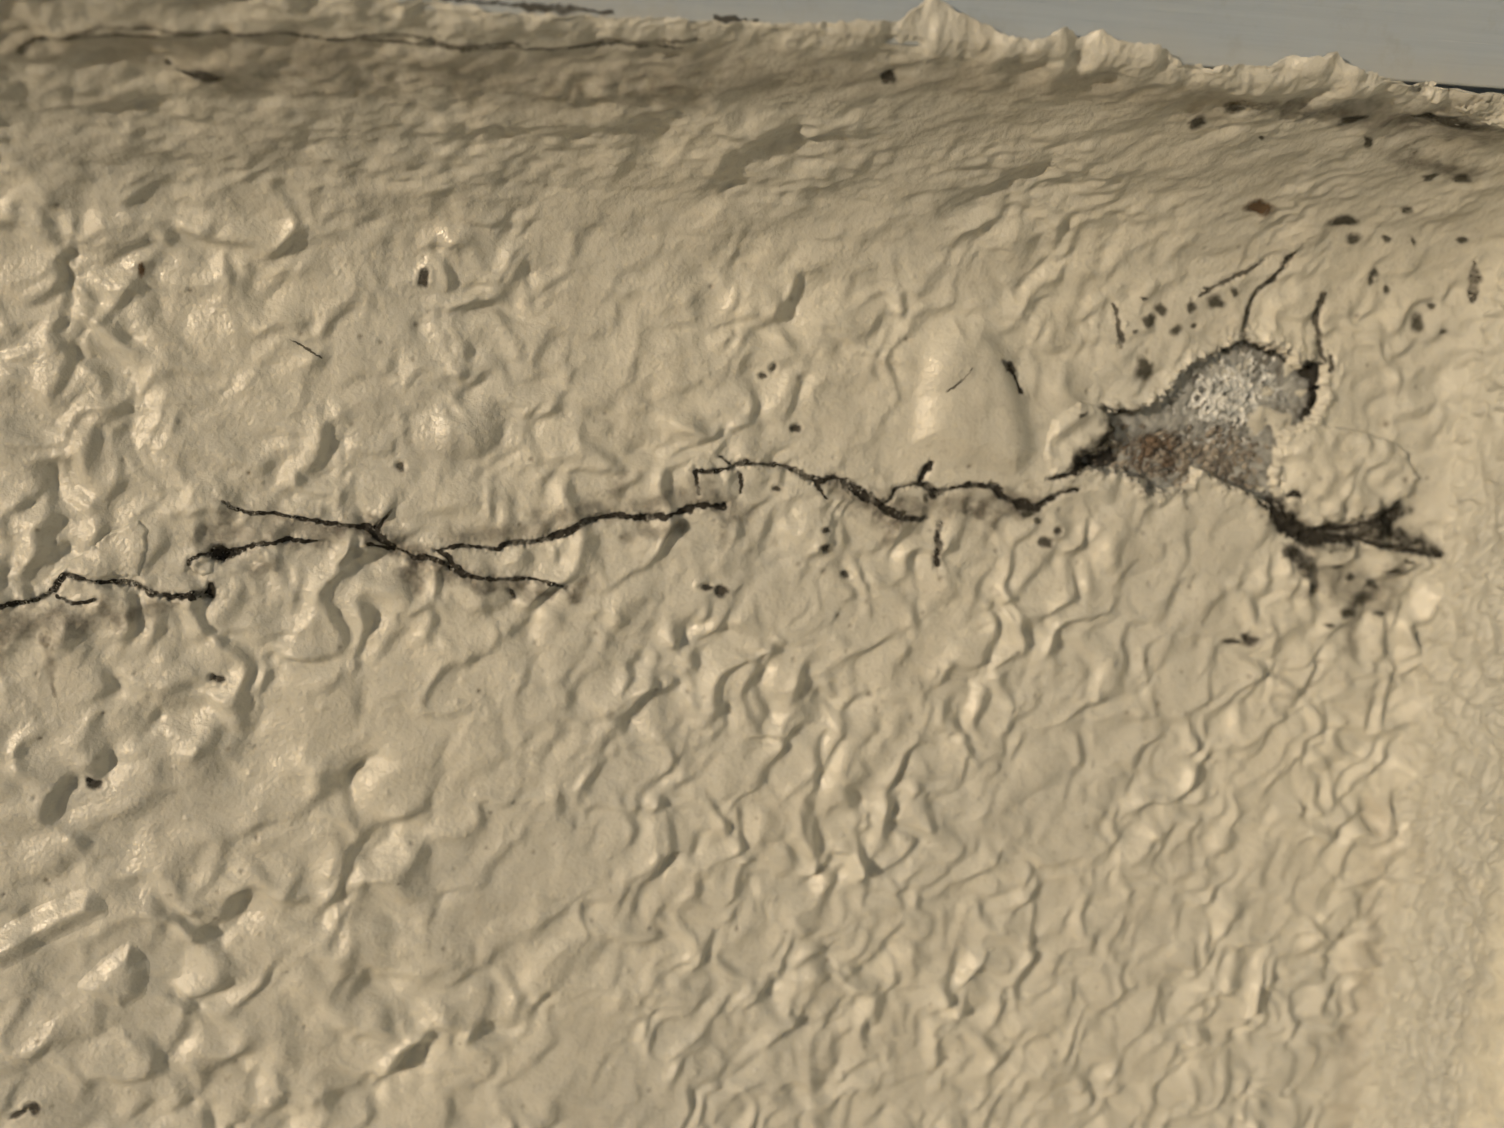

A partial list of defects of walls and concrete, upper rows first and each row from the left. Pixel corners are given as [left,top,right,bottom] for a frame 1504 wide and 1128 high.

spalling [1044,339,1418,527]
crack [0,450,1105,610]
crack [1235,485,1442,558]